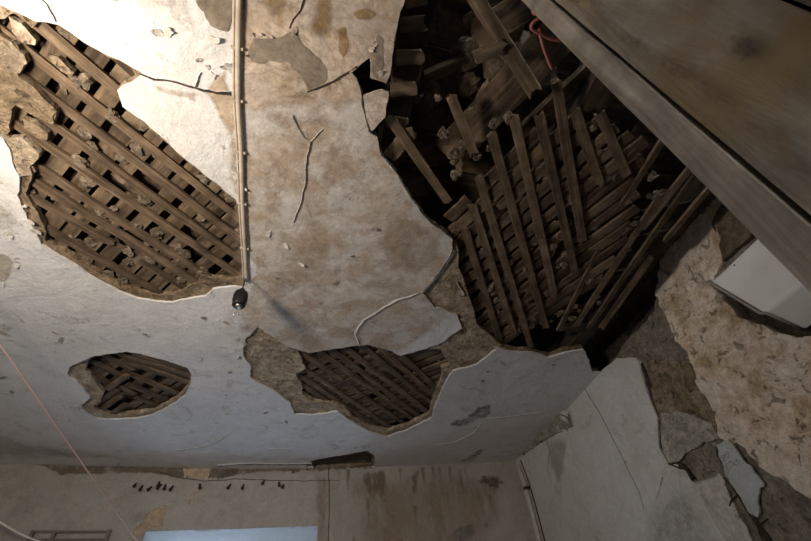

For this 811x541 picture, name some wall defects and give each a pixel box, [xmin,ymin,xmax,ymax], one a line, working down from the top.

spalling [0,0,245,301]
spalling [68,352,191,418]
crack [140,72,230,96]
crack [293,115,323,222]
leakage [234,0,440,352]
spalling [235,0,811,541]